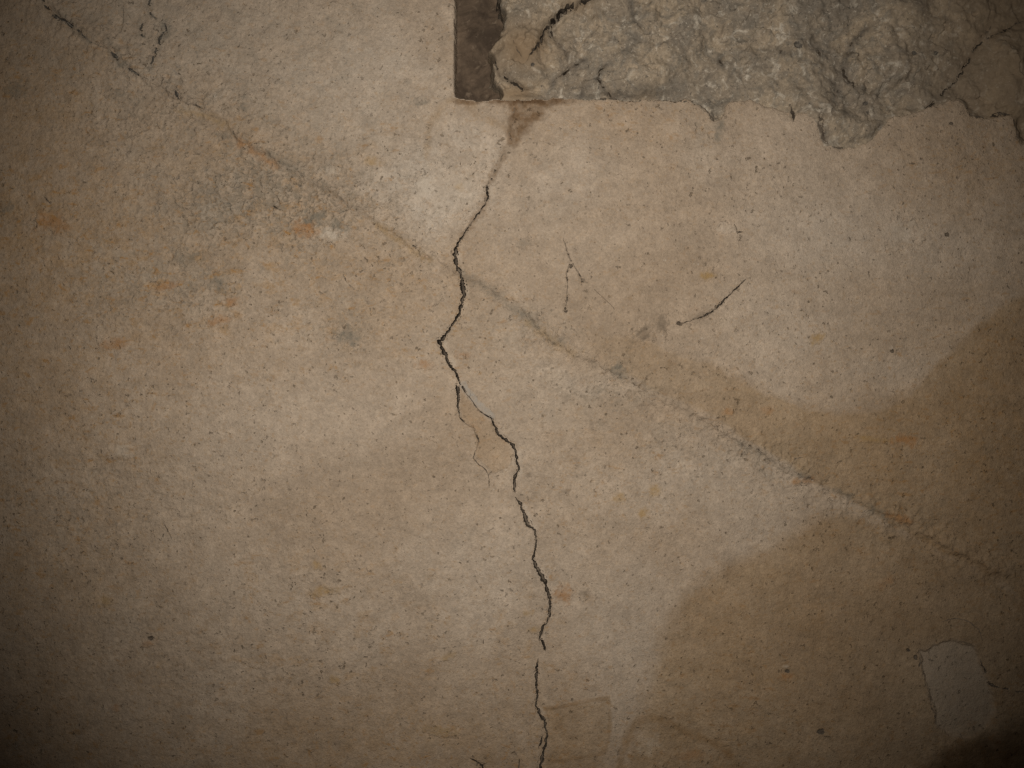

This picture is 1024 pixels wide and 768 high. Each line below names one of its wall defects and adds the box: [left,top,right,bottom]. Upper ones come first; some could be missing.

spalling [457,0,1024,150]
crack [680,279,746,324]
crack [436,106,553,768]